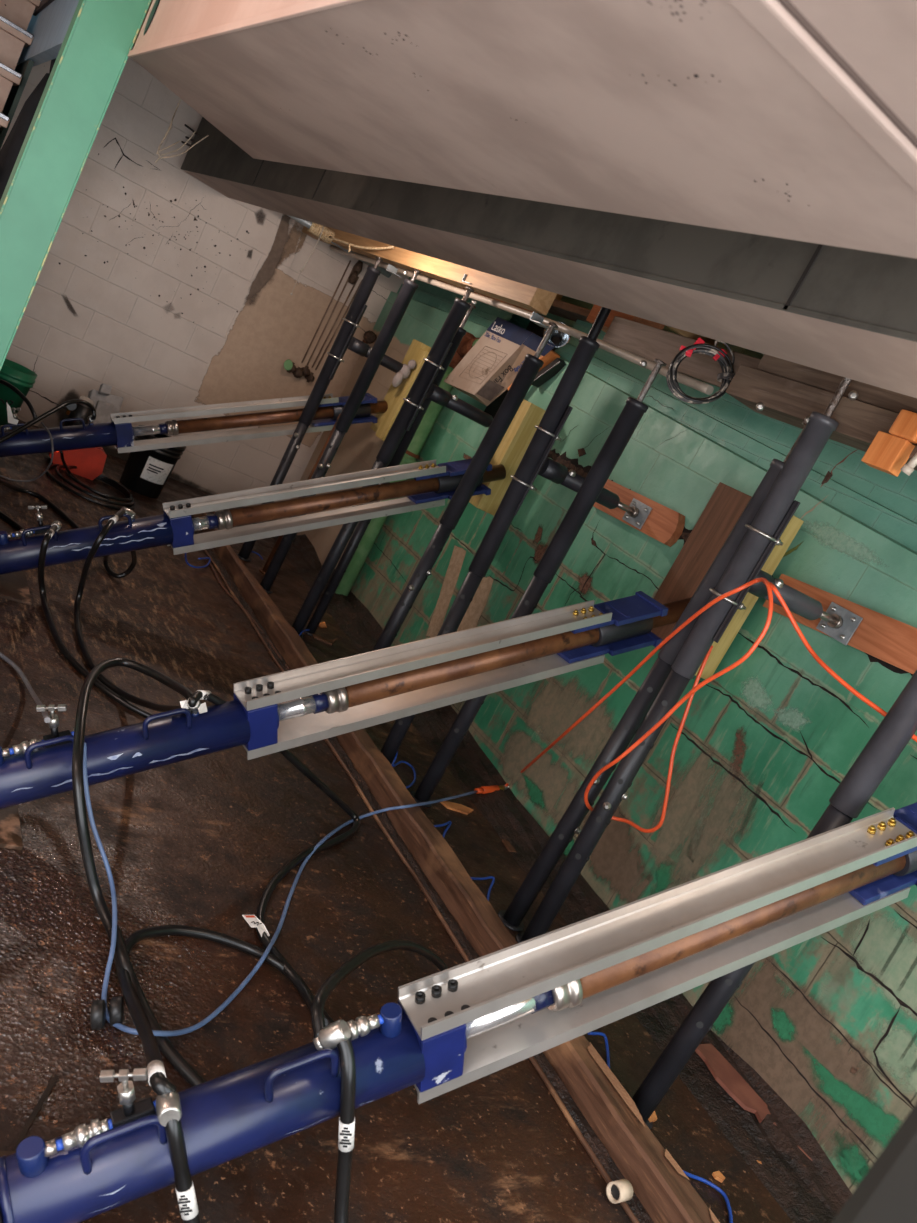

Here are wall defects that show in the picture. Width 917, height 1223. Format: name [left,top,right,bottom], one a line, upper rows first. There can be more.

crack [547,426,631,490]
crack [678,526,692,546]
peeling [498,678,612,825]
peeling [589,751,753,903]
crack [670,723,795,832]
crack [700,681,841,784]
crack [738,632,867,725]
crack [864,652,913,676]
crack [734,996,877,1159]
peeling [695,916,917,1185]
crack [772,912,917,1109]